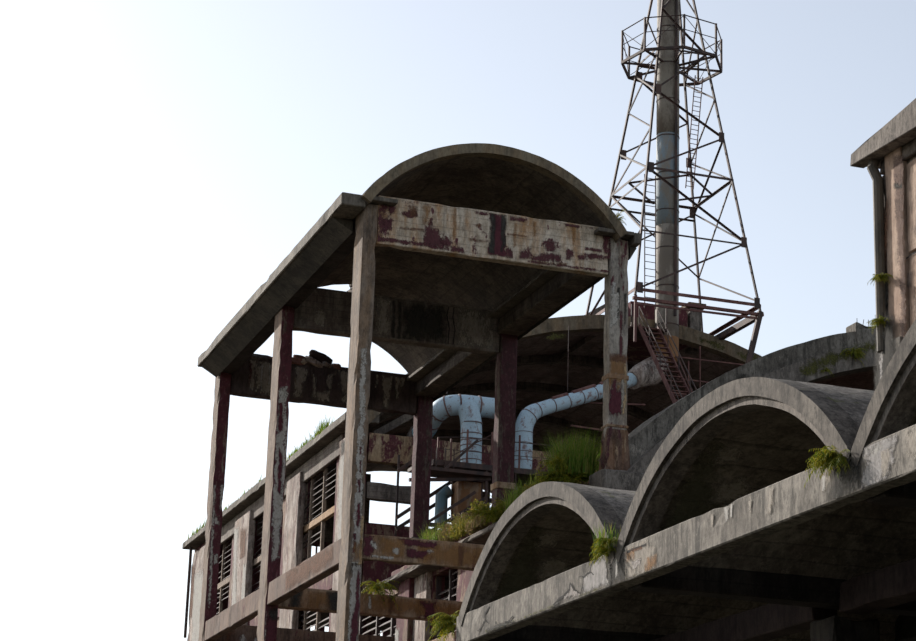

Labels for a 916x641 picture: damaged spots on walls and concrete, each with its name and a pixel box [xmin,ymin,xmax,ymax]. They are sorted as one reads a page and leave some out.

peeling [377,202,611,273]
peeling [609,293,627,415]
peeling [271,386,288,561]
peeling [348,348,437,641]
crack [579,558,599,595]
peeling [264,608,278,641]
crack [477,607,514,635]